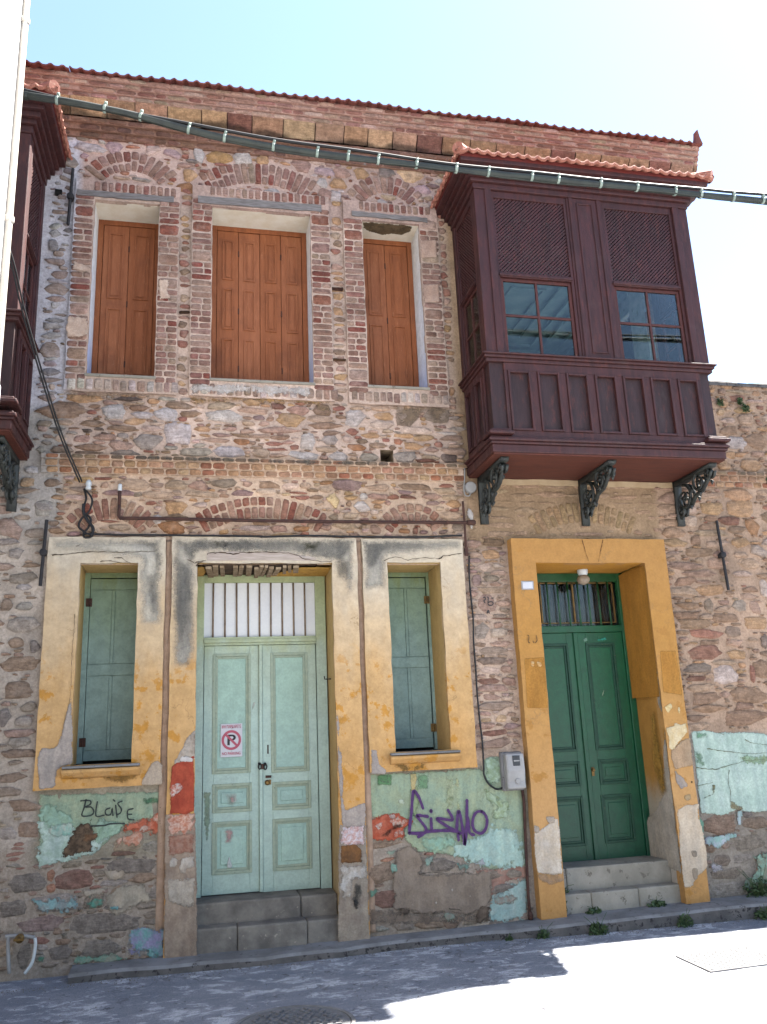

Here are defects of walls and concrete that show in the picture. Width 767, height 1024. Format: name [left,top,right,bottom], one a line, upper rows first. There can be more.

crack [52,545,154,563]
water stain [56,542,159,622]
water stain [175,541,352,664]
water stain [366,542,458,587]
flaking render [31,703,198,965]
peeling [336,716,563,942]
peeling [647,677,767,889]